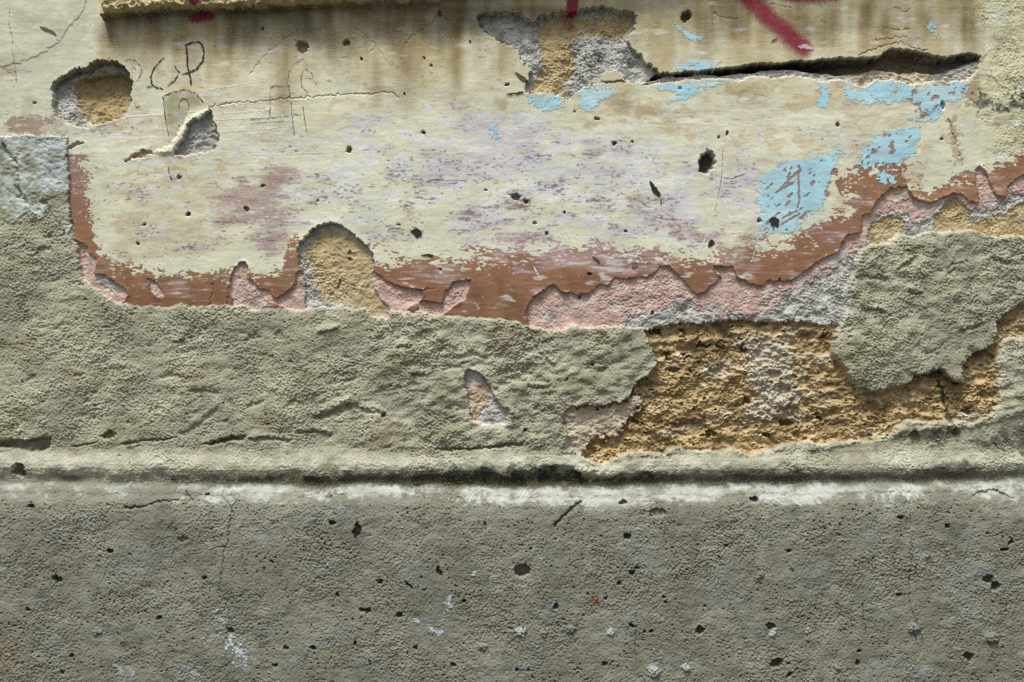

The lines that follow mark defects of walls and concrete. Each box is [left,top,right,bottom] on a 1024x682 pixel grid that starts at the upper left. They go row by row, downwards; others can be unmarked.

spalling [53,61,134,129]
spalling [125,107,220,163]
peeling [74,235,131,304]
peeling [145,275,166,302]
spalling [226,223,473,320]
spalling [477,7,1024,464]
spalling [464,369,509,425]